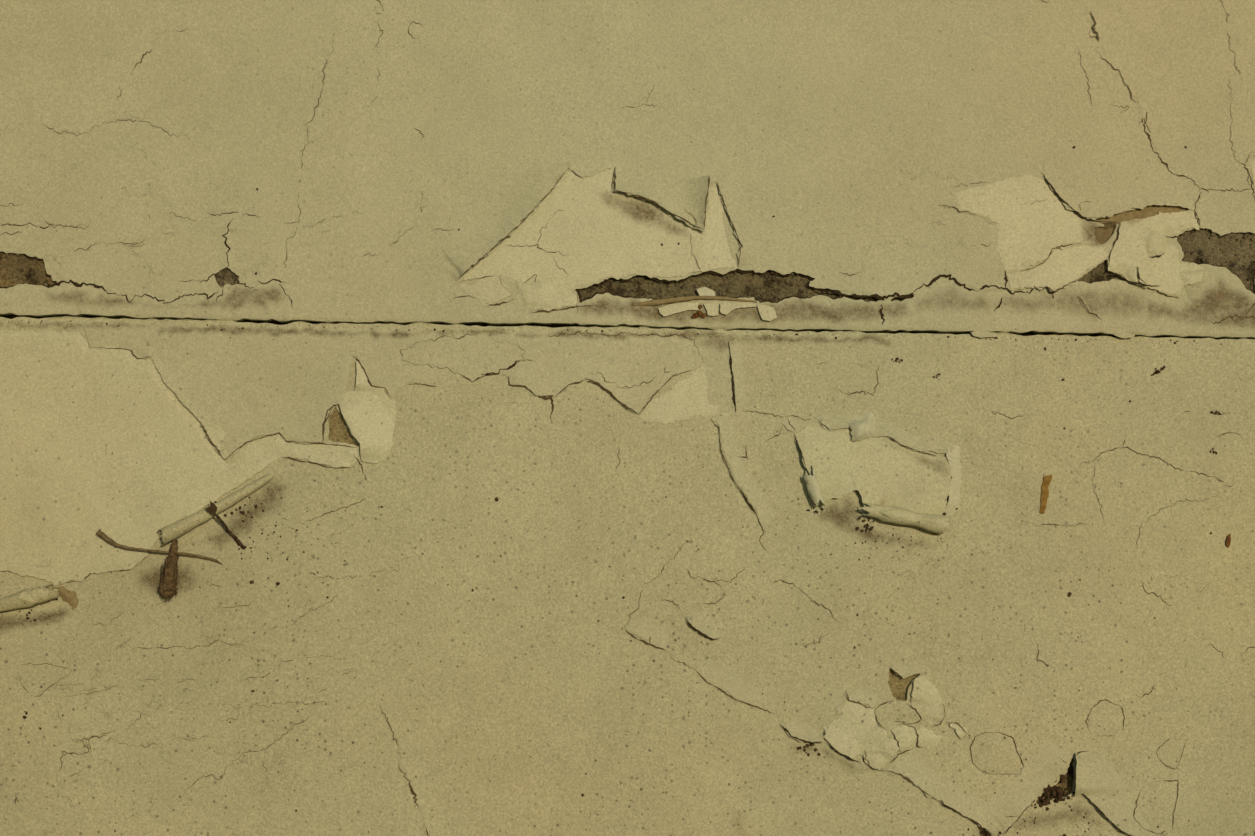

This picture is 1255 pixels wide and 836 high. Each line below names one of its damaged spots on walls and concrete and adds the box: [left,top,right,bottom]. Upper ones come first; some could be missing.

spalling [0,252,72,307]
crack [0,28,359,309]
peeling [439,153,914,321]
peeling [956,165,1195,291]
crack [1078,0,1255,224]
spalling [1177,229,1255,294]
peeling [0,322,772,612]
crack [538,395,554,419]
crack [400,331,704,375]
peeling [765,412,962,536]
crack [380,706,430,836]
peeling [626,618,1154,836]